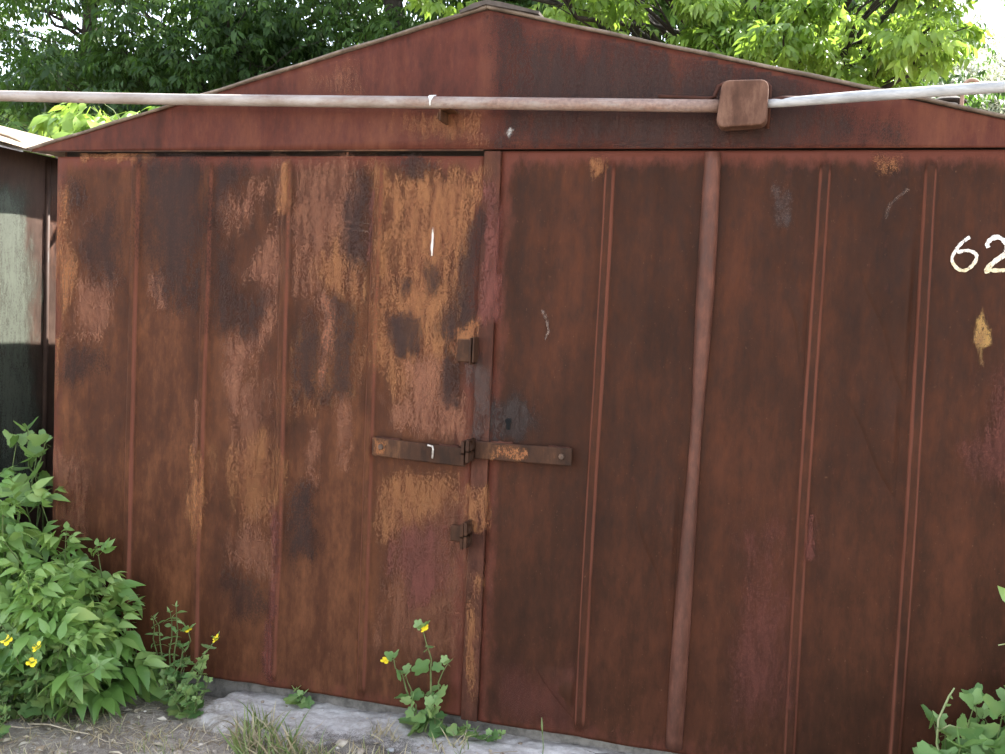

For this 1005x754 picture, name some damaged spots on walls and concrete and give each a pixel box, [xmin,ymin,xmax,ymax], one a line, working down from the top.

corrosion [590,158,608,177]
corrosion [56,184,117,344]
corrosion [217,153,504,445]
corrosion [973,313,992,347]
corrosion [186,399,205,542]
corrosion [374,468,491,545]
corrosion [491,445,528,463]
corrosion [466,574,483,696]